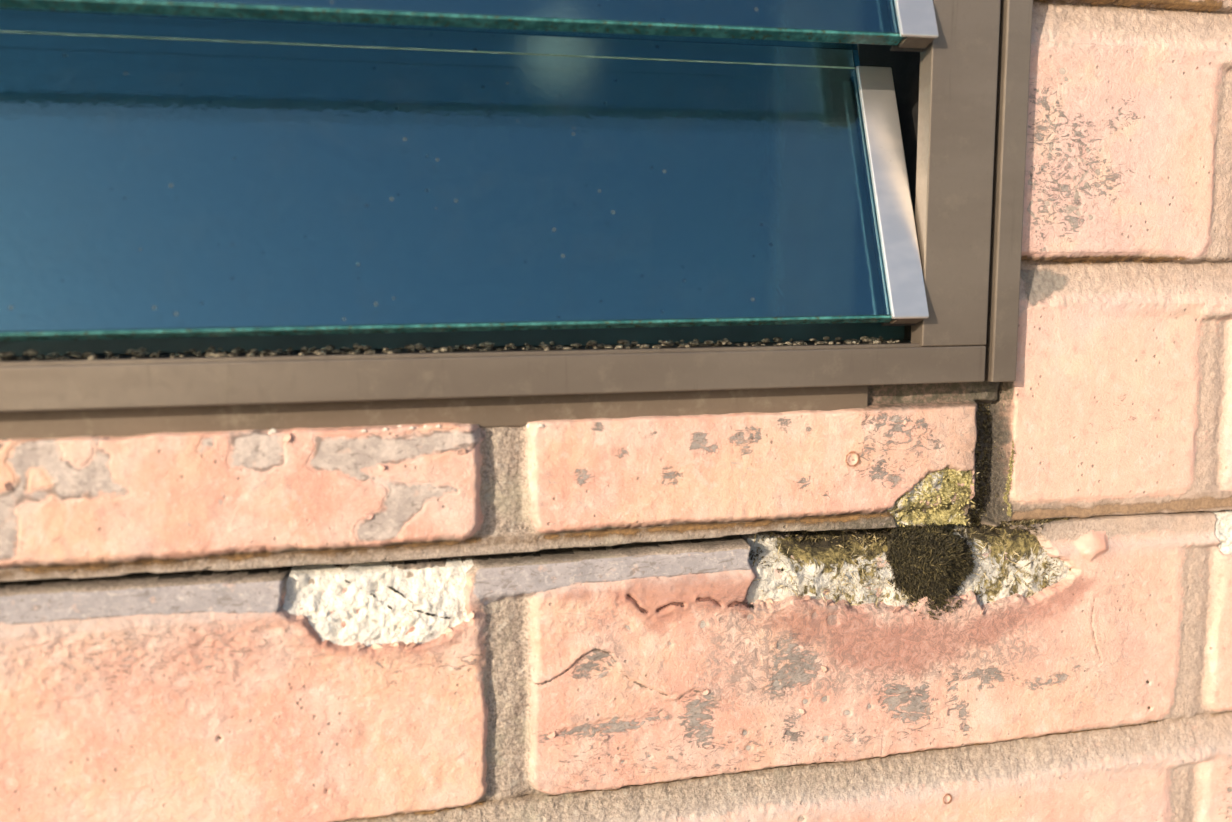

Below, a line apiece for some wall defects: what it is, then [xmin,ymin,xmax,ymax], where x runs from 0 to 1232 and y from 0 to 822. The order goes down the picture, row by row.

peeling [0,436,130,561]
crack [0,566,293,588]
peeling [227,429,291,472]
peeling [306,425,486,542]
spalling [0,528,929,682]
crack [382,531,787,564]
spalling [938,518,1072,615]
spalling [1210,510,1232,555]